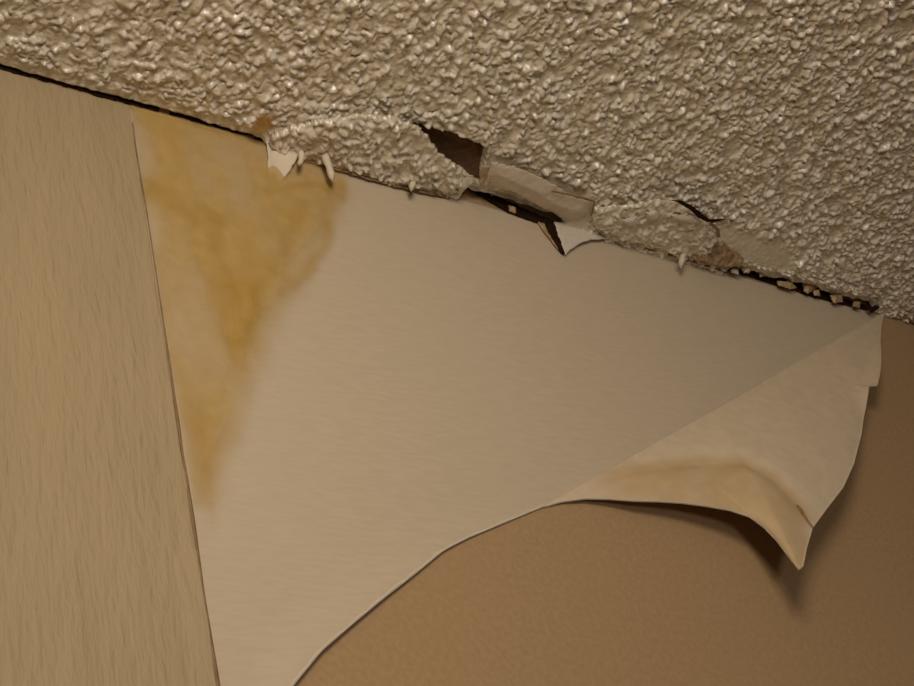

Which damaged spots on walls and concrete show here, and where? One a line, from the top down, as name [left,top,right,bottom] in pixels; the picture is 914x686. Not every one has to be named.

leakage [139,109,323,360]
peeling [539,313,885,571]